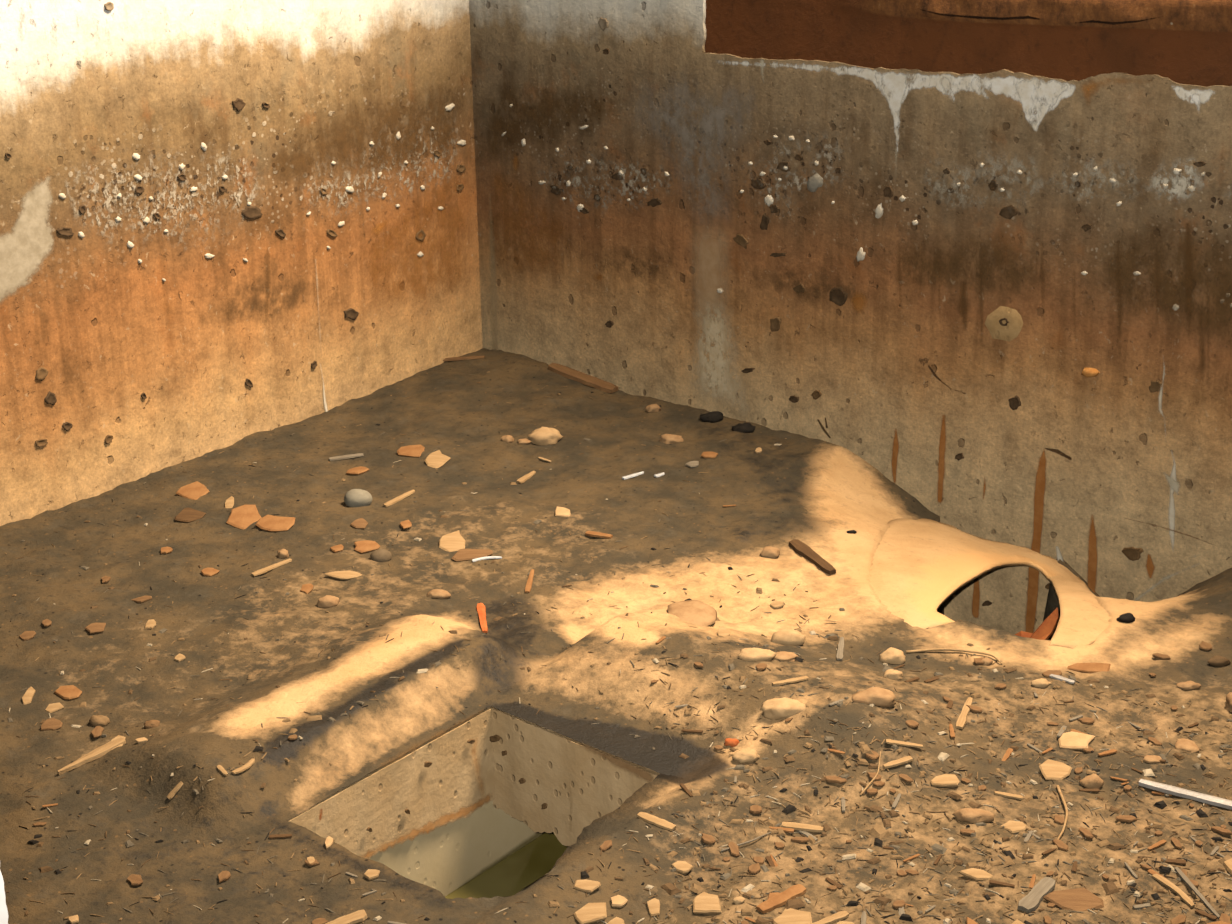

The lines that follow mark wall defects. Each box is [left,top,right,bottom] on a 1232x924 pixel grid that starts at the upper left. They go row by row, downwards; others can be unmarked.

water stain [275,97,452,173]
efflorescence [723,60,1075,151]
efflorescence [1174,86,1213,108]
water stain [699,239,735,397]
water stain [1109,238,1232,328]
rust [938,417,946,502]
rust [1031,451,1046,553]
rust [972,578,980,618]
rust [1026,567,1039,633]
rust [1088,518,1097,593]